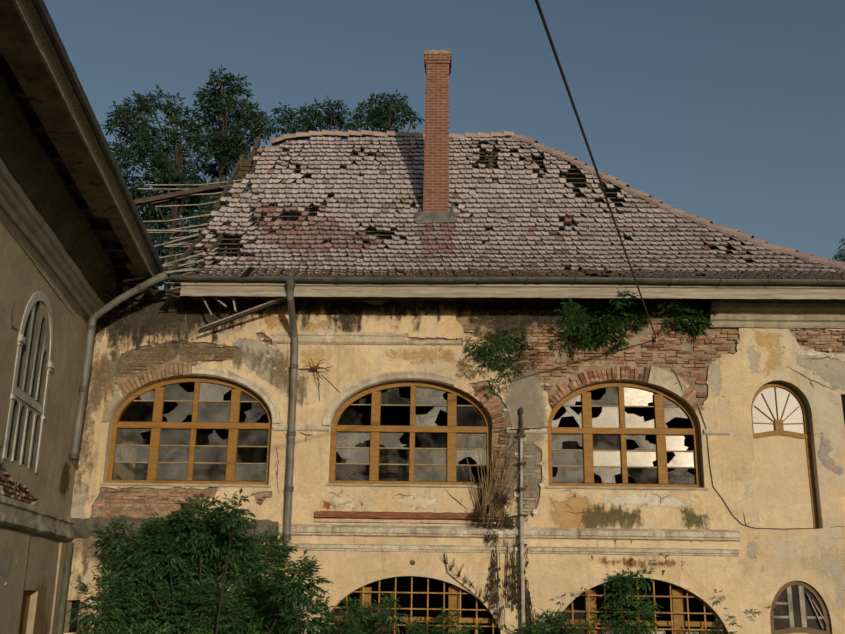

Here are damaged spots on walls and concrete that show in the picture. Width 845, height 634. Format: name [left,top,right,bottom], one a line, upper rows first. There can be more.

leakage [295,306,312,327]
flaking render [789,328,845,391]
leakage [64,292,306,493]
flaking render [387,301,786,517]
spalling [818,432,844,477]
flaking render [0,460,37,504]
flaking render [71,482,220,519]
peeling [550,489,699,528]